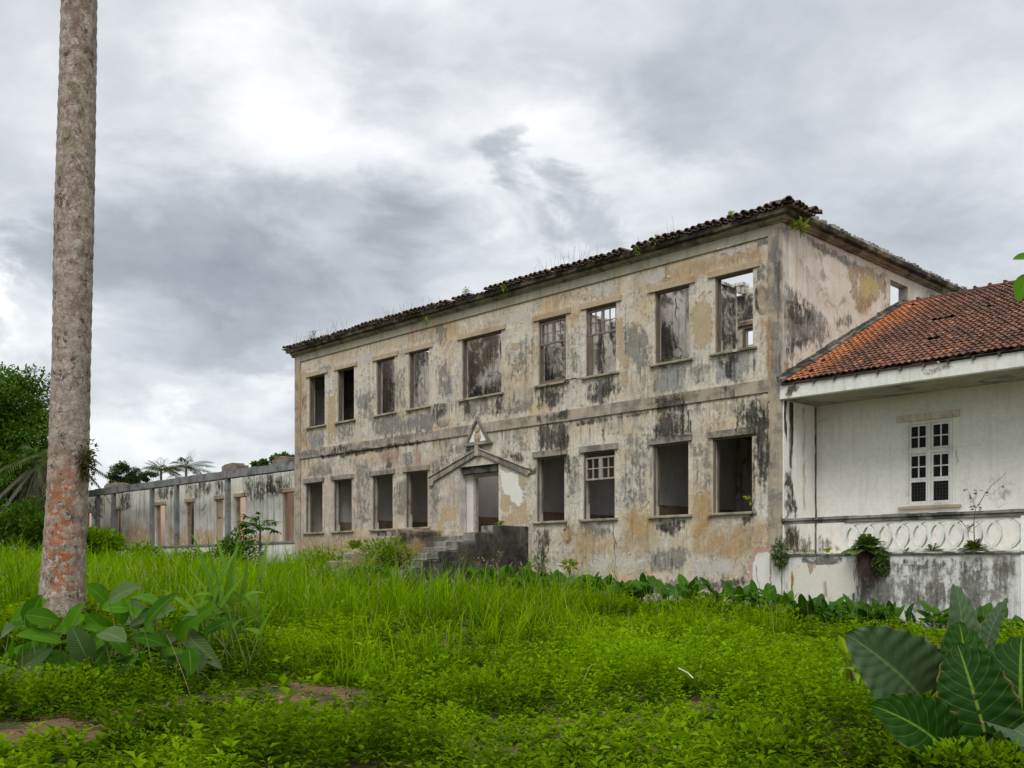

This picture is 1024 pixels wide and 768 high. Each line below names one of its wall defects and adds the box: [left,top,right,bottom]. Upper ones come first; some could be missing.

peeling [848,261,886,313]
water stain [299,352,451,523]
water stain [462,329,612,497]
water stain [587,294,770,525]
water stain [757,235,852,553]
water stain [187,481,225,498]
water stain [244,474,292,500]
peeling [499,469,530,526]
water stain [650,519,686,591]
water stain [852,556,1014,612]